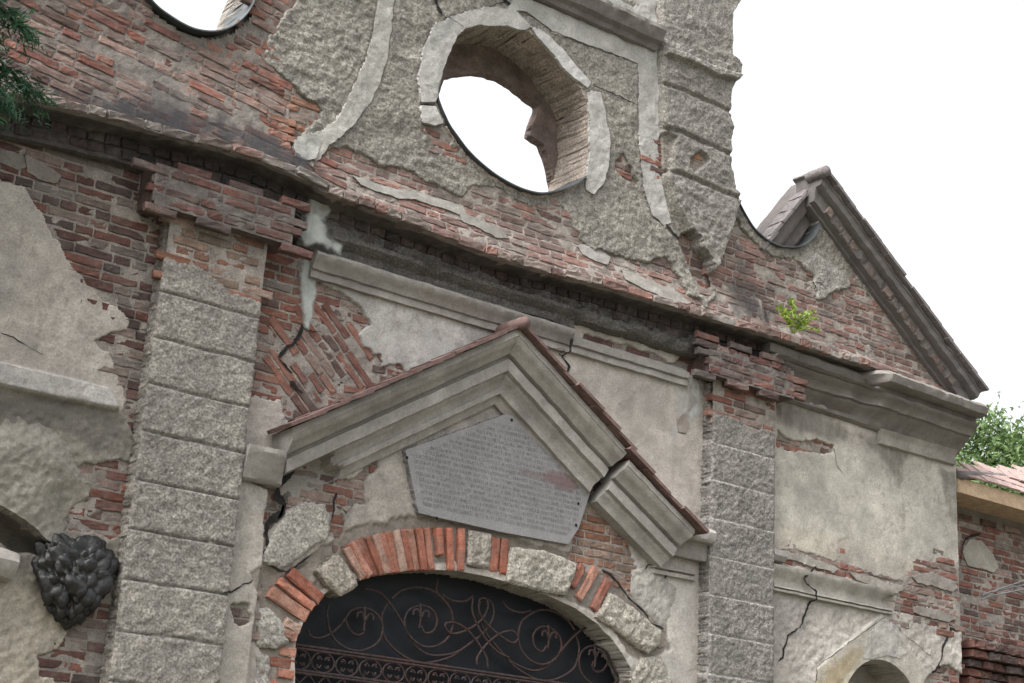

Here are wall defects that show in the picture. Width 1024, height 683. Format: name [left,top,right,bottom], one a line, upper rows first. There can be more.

water stain [301,199,341,252]
spalling [0,0,951,434]
water stain [301,259,316,328]
crack [278,324,320,394]
crack [558,338,572,372]
spalling [704,380,833,454]
spalling [65,460,130,540]
crack [222,471,312,594]
crack [587,480,601,503]
crack [779,566,818,661]
spalling [776,538,998,660]